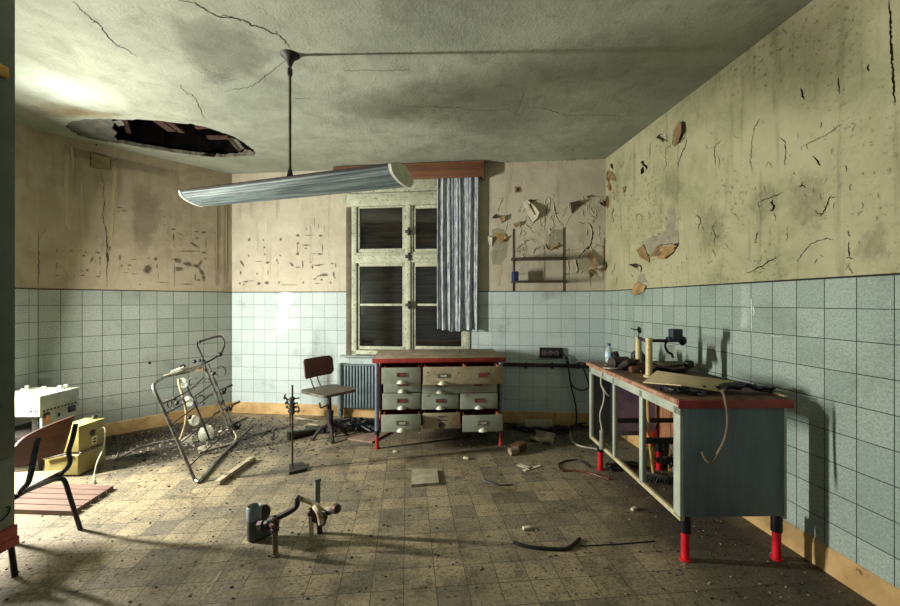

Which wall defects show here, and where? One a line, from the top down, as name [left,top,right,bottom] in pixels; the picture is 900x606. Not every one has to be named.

crack [73,2,136,56]
crack [178,0,289,92]
crack [867,1,895,106]
flaking render [66,125,256,157]
peeling [656,122,686,148]
crack [102,179,110,285]
peeling [487,164,626,286]
peeling [628,208,679,295]
crack [620,120,879,273]